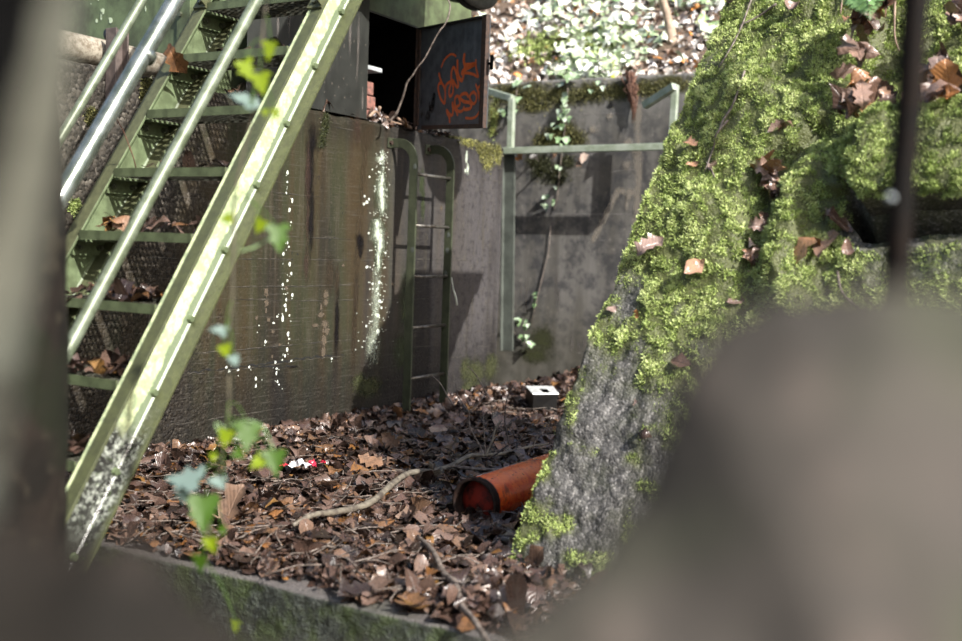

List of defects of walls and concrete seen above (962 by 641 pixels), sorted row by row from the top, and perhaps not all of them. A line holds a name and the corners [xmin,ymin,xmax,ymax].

efflorescence [273,241,293,385]
water stain [327,261,339,362]
water stain [352,151,390,356]